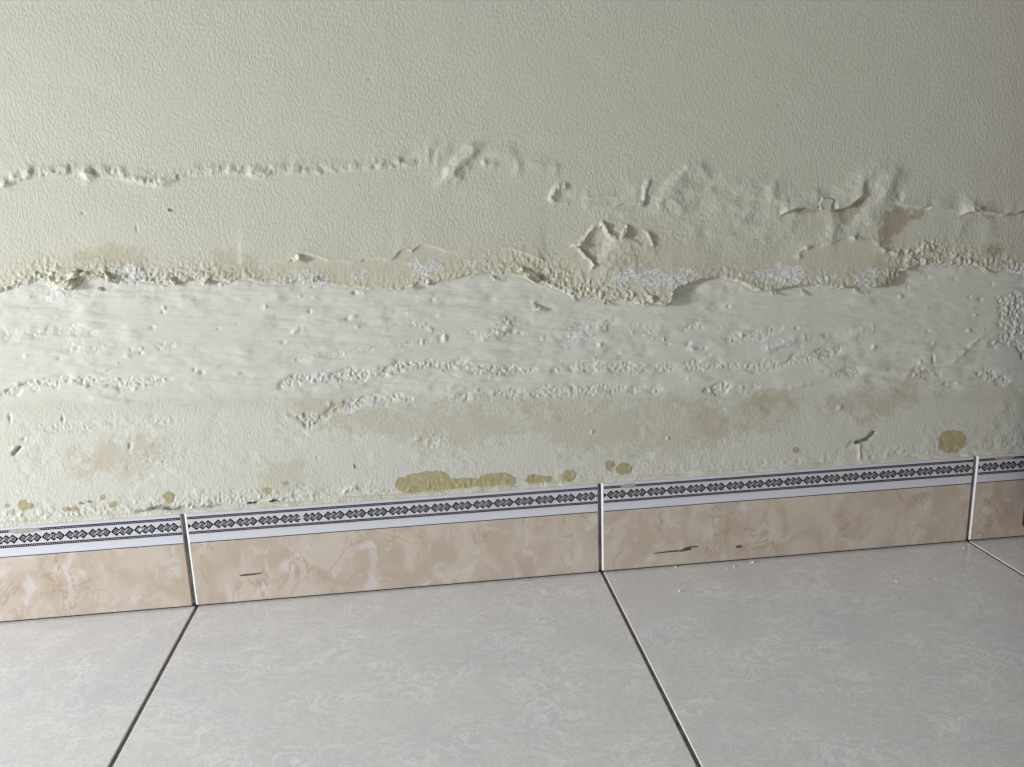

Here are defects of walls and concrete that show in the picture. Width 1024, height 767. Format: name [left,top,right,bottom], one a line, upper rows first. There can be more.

flaking render [901,225,1024,277]
water stain [111,263,144,284]
peeling [0,236,552,293]
water stain [612,266,695,291]
water stain [755,260,805,288]
water stain [939,430,966,453]
water stain [605,461,632,475]
water stain [395,470,575,493]